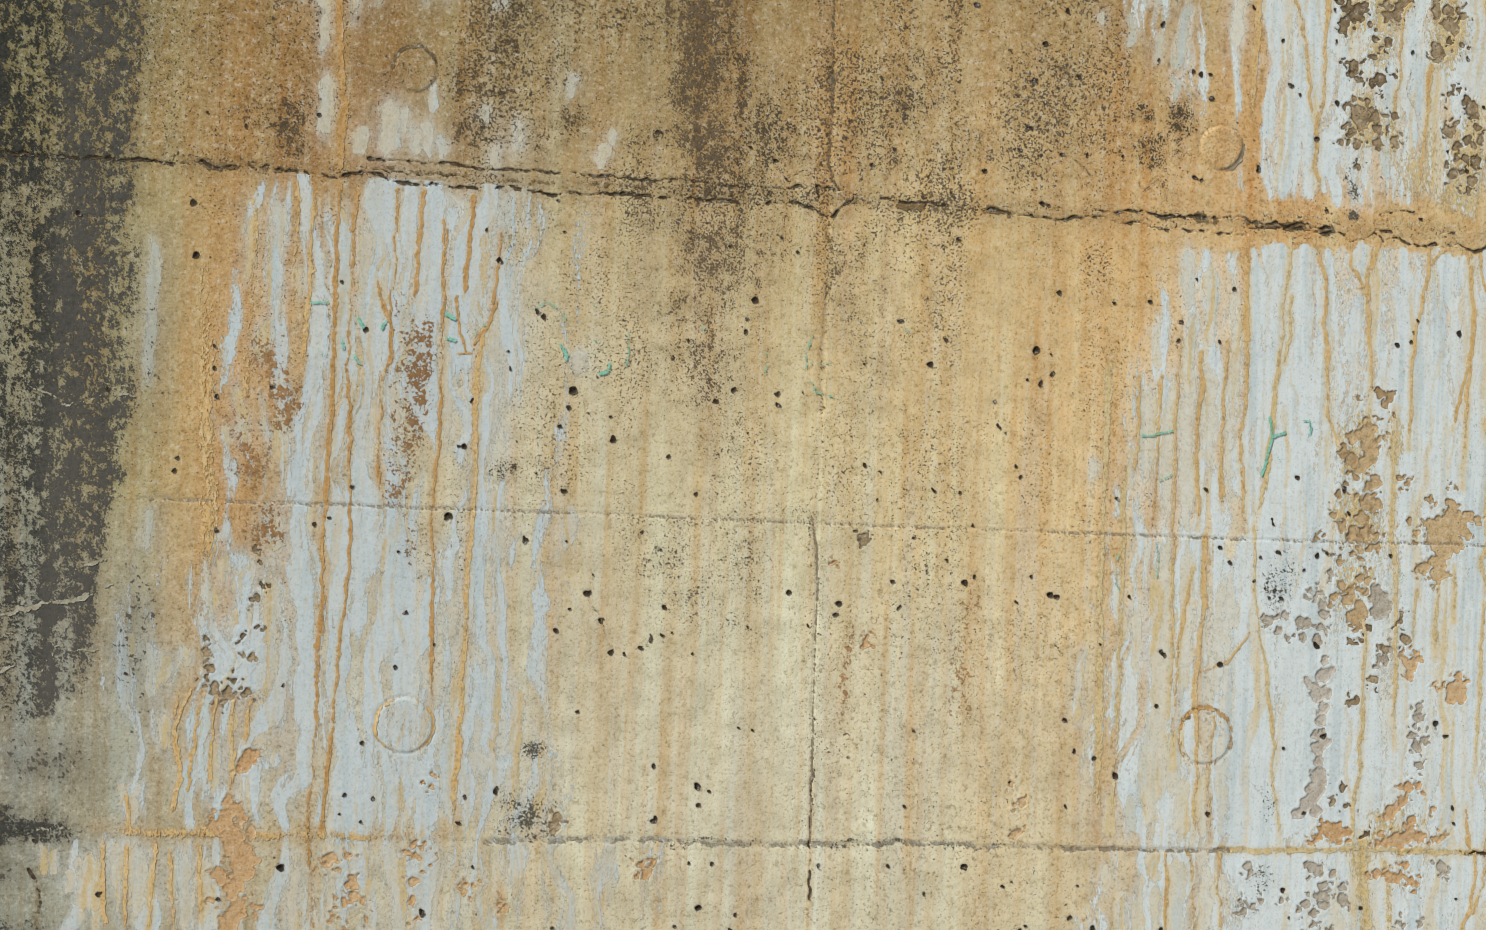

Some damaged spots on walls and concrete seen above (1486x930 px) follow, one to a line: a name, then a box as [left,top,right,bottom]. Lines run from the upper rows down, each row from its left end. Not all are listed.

rust [192,232,220,588]
water stain [0,0,622,930]
rust [241,0,409,930]
rust [376,188,427,488]
rust [428,194,502,816]
crack [3,150,1486,253]
rust [1092,235,1486,930]
peeling [1233,386,1485,930]
rust [1241,0,1486,234]
peeling [1333,0,1473,171]
peeling [1441,82,1486,196]